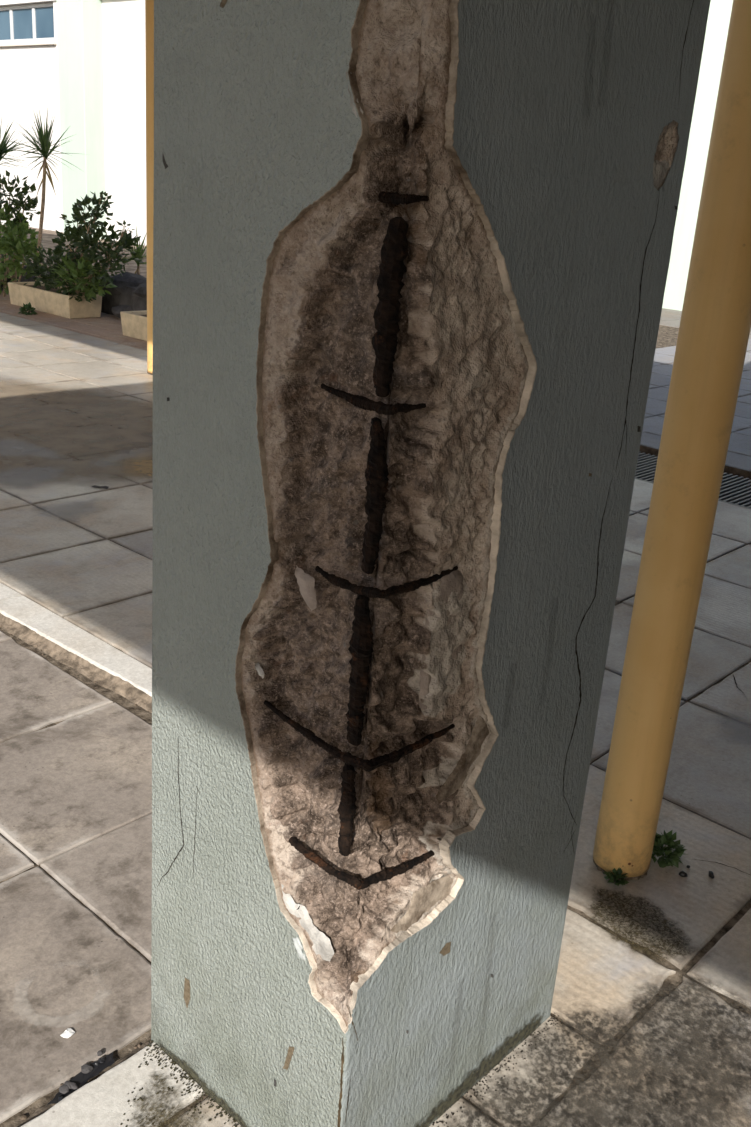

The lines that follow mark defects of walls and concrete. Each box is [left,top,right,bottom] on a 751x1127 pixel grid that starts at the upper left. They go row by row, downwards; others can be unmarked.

spalling [235,0,537,1033]
crack [563,192,660,855]
damp [156,1044,247,1127]
damp [416,978,751,1127]